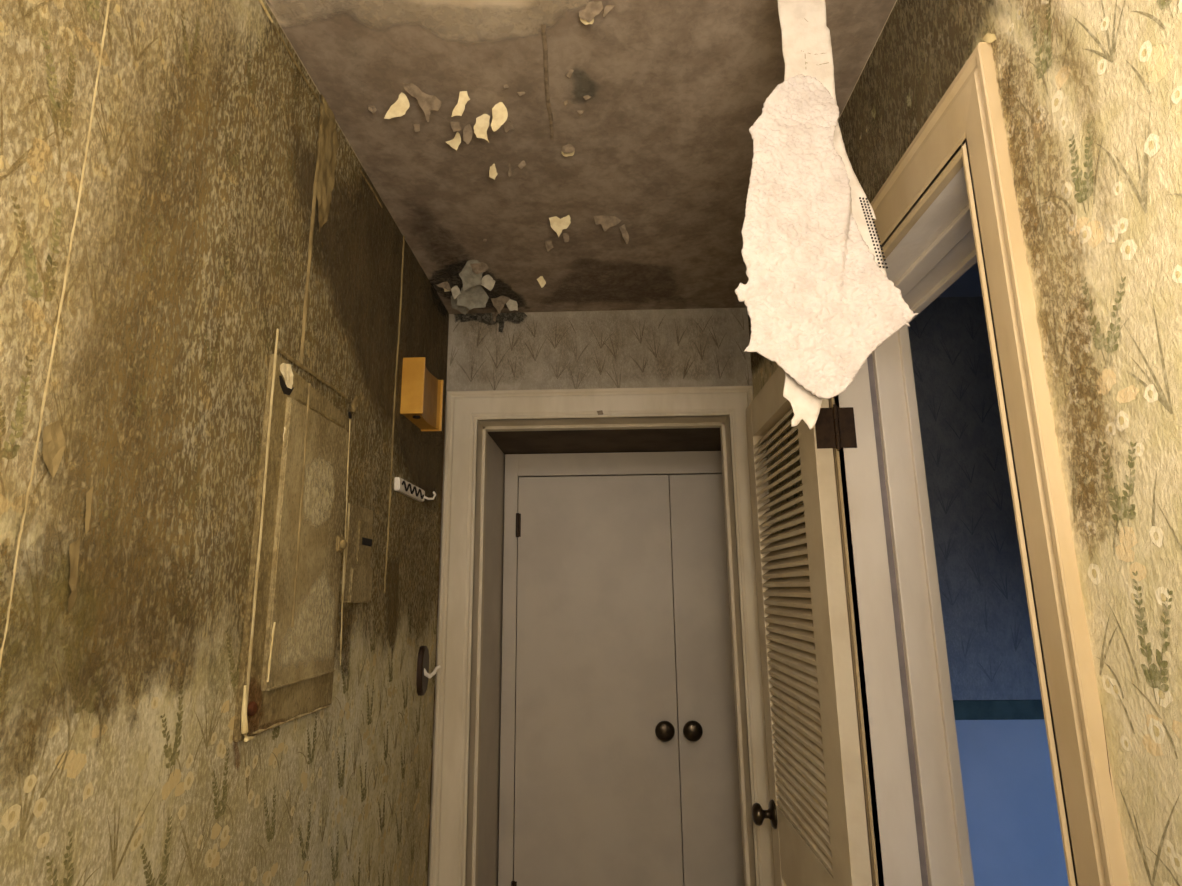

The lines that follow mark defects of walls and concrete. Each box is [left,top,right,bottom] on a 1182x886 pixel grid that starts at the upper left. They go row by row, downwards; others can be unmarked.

peeling [579,0,615,25]
peeling [368,83,526,151]
peeling [489,160,526,180]
peeling [545,215,571,252]
peeling [594,215,629,244]
peeling [437,260,518,322]
damp [825,0,1110,556]
damp [0,0,785,783]